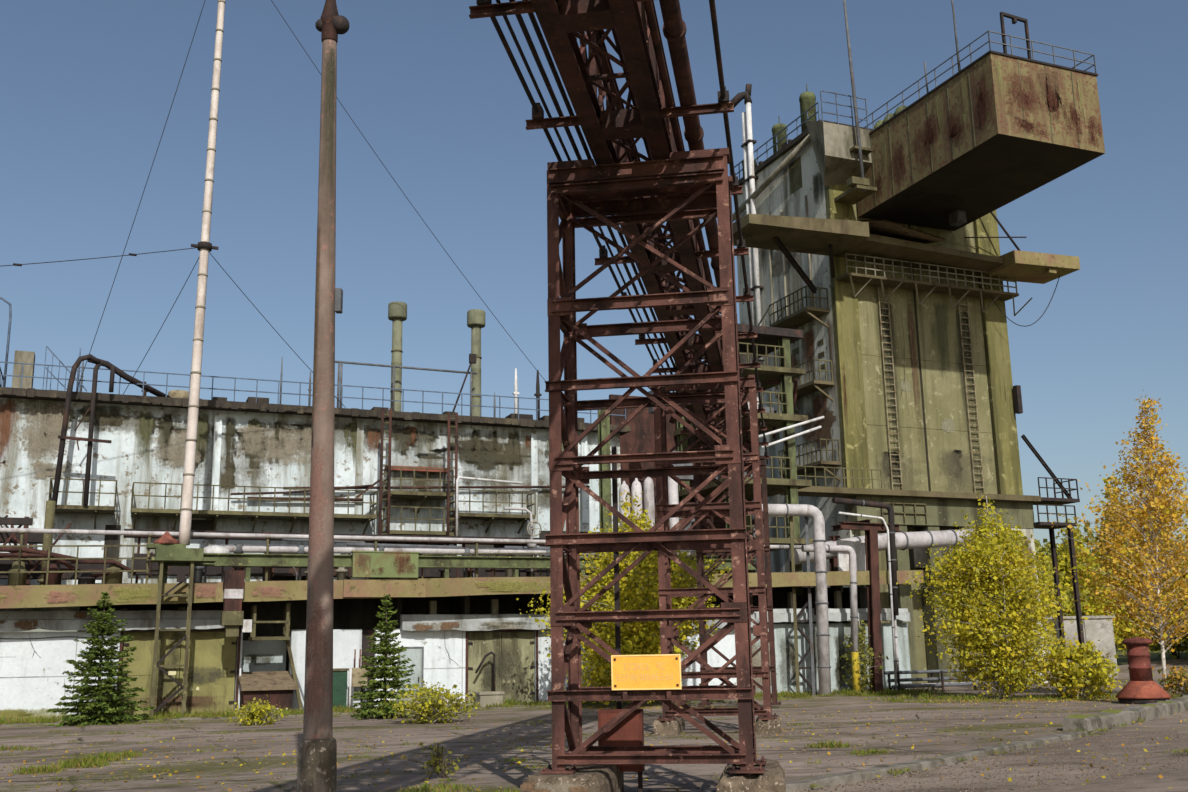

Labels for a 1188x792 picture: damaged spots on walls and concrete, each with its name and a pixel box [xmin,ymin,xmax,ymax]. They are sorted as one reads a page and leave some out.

rust [791,331,814,387]
water stain [881,306,897,407]
water stain [932,304,973,398]
rust [798,393,828,423]
water stain [136,413,171,451]
water stain [196,415,210,450]
water stain [224,419,235,453]
water stain [345,422,357,456]